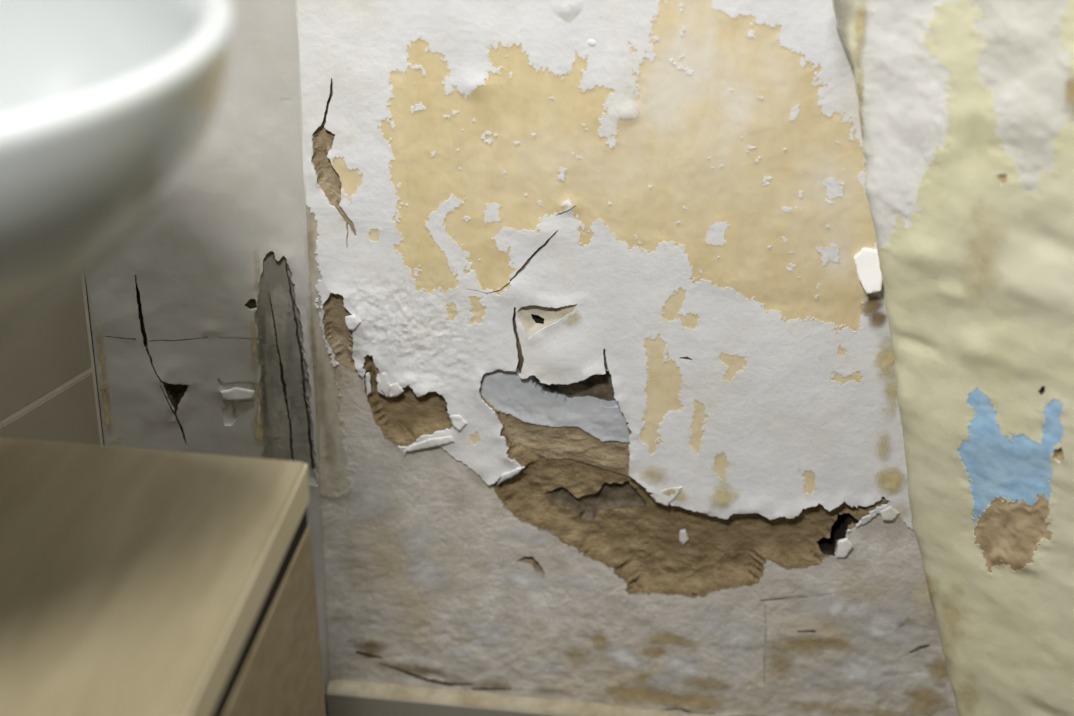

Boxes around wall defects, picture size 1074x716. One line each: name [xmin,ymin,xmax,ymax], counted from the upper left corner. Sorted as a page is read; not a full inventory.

spalling [312,80,381,246]
peeling [377,0,1074,357]
crack [118,275,204,445]
crack [490,206,576,373]
flaking render [218,204,959,716]
peeling [958,386,1065,573]